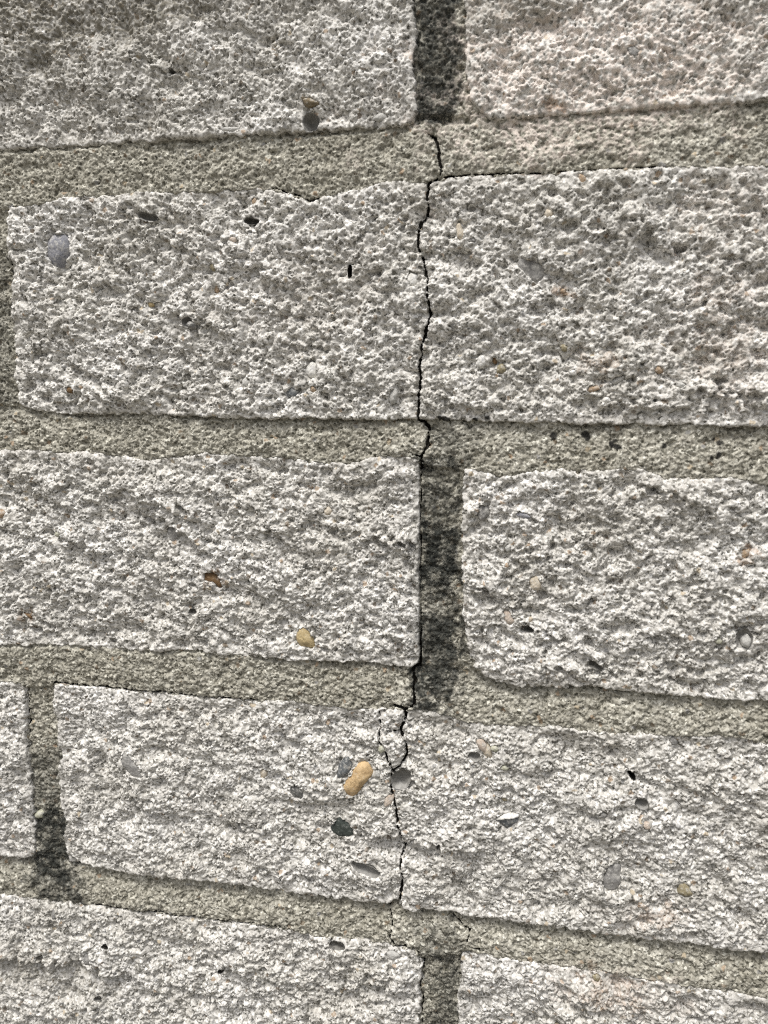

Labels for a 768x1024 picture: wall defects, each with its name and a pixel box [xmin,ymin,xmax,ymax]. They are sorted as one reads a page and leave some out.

leakage [413,0,466,123]
crack [416,135,656,563]
leakage [413,454,461,596]
leakage [409,610,465,715]
leakage [24,804,84,904]
crack [379,611,425,1021]